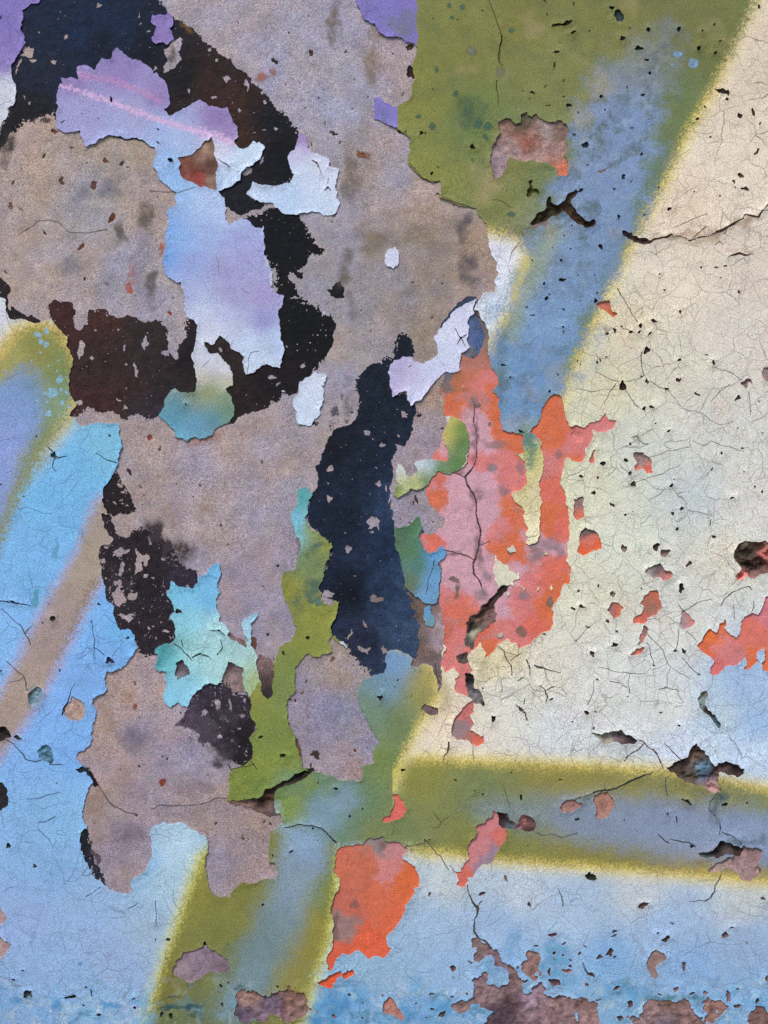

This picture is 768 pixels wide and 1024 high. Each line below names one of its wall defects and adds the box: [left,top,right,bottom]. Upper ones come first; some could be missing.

spalling [526,180,596,236]
crack [645,204,768,258]
crack [581,288,750,483]
peeling [0,0,498,897]
crack [425,399,489,595]
spalling [456,585,509,722]
crack [497,645,561,721]
crack [588,586,754,704]
crack [575,740,743,847]
spalling [667,744,744,806]
peeling [426,933,601,1024]
peeling [617,987,768,1024]